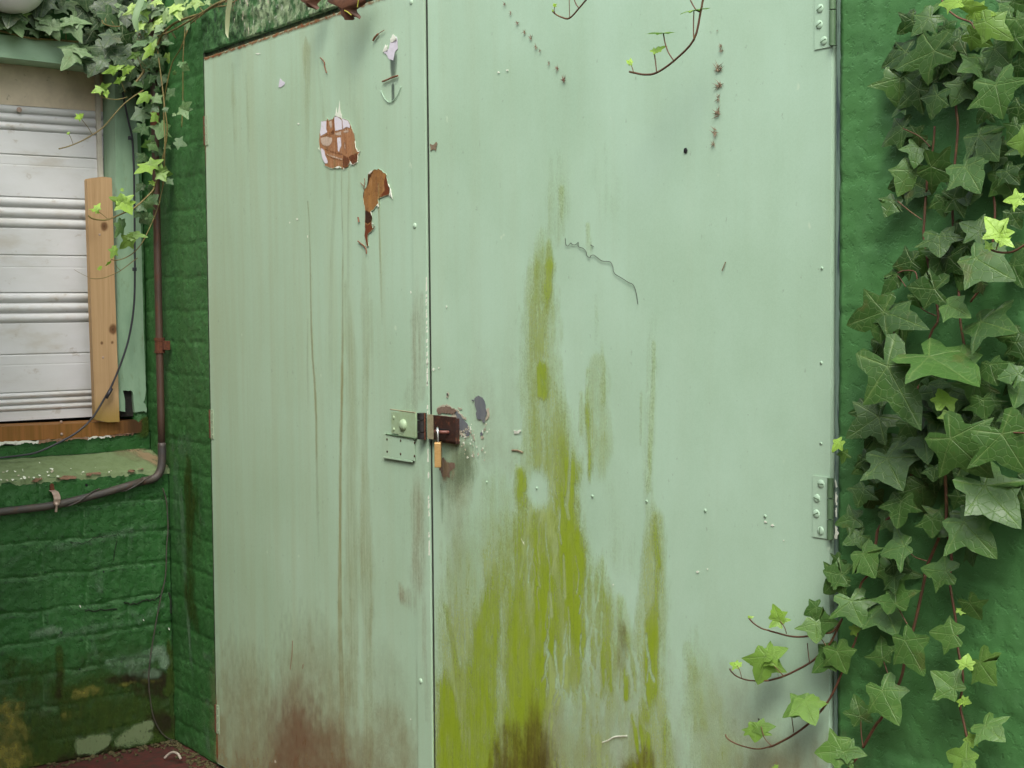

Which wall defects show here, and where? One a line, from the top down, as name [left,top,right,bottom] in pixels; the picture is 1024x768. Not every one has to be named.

peeling [318,101,360,170]
peeling [357,168,393,254]
crack [565,238,638,304]
peeling [425,277,439,386]
peeling [427,391,490,478]